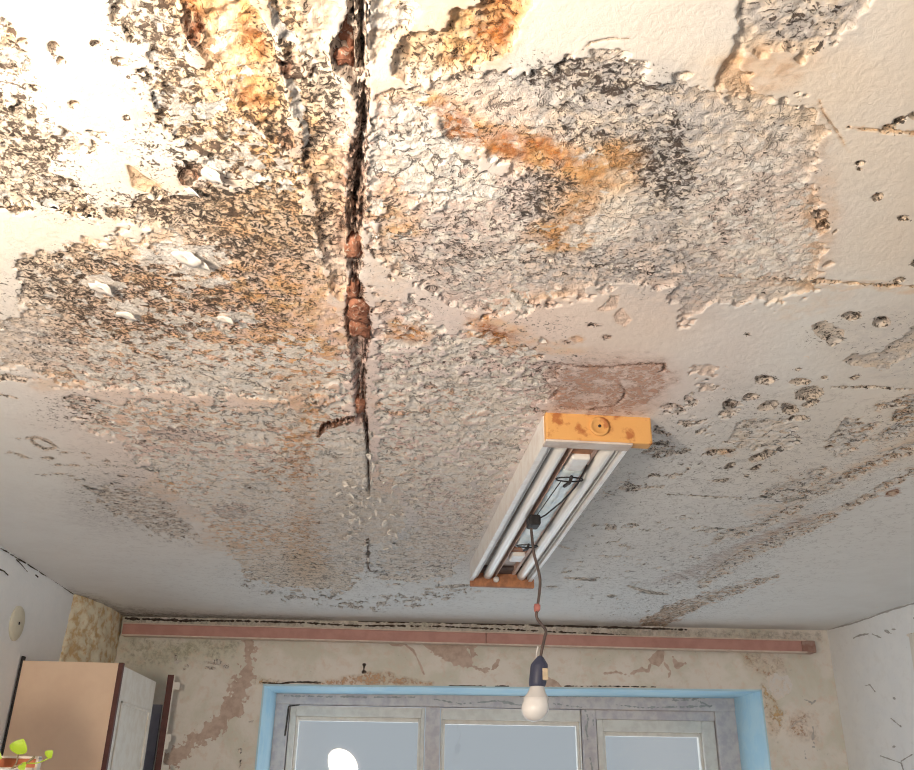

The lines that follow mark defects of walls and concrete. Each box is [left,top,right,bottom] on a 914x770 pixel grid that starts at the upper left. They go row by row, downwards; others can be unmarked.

crack [846,125,914,135]
spalling [882,112,914,130]
crack [315,0,429,495]
flaking render [0,0,871,612]
crack [721,274,914,288]
flaking render [843,326,914,380]
damp [553,364,665,414]
damp [80,479,201,543]
peeling [546,394,914,627]
crack [0,548,73,594]
peeling [163,640,258,769]
damp [317,673,432,685]